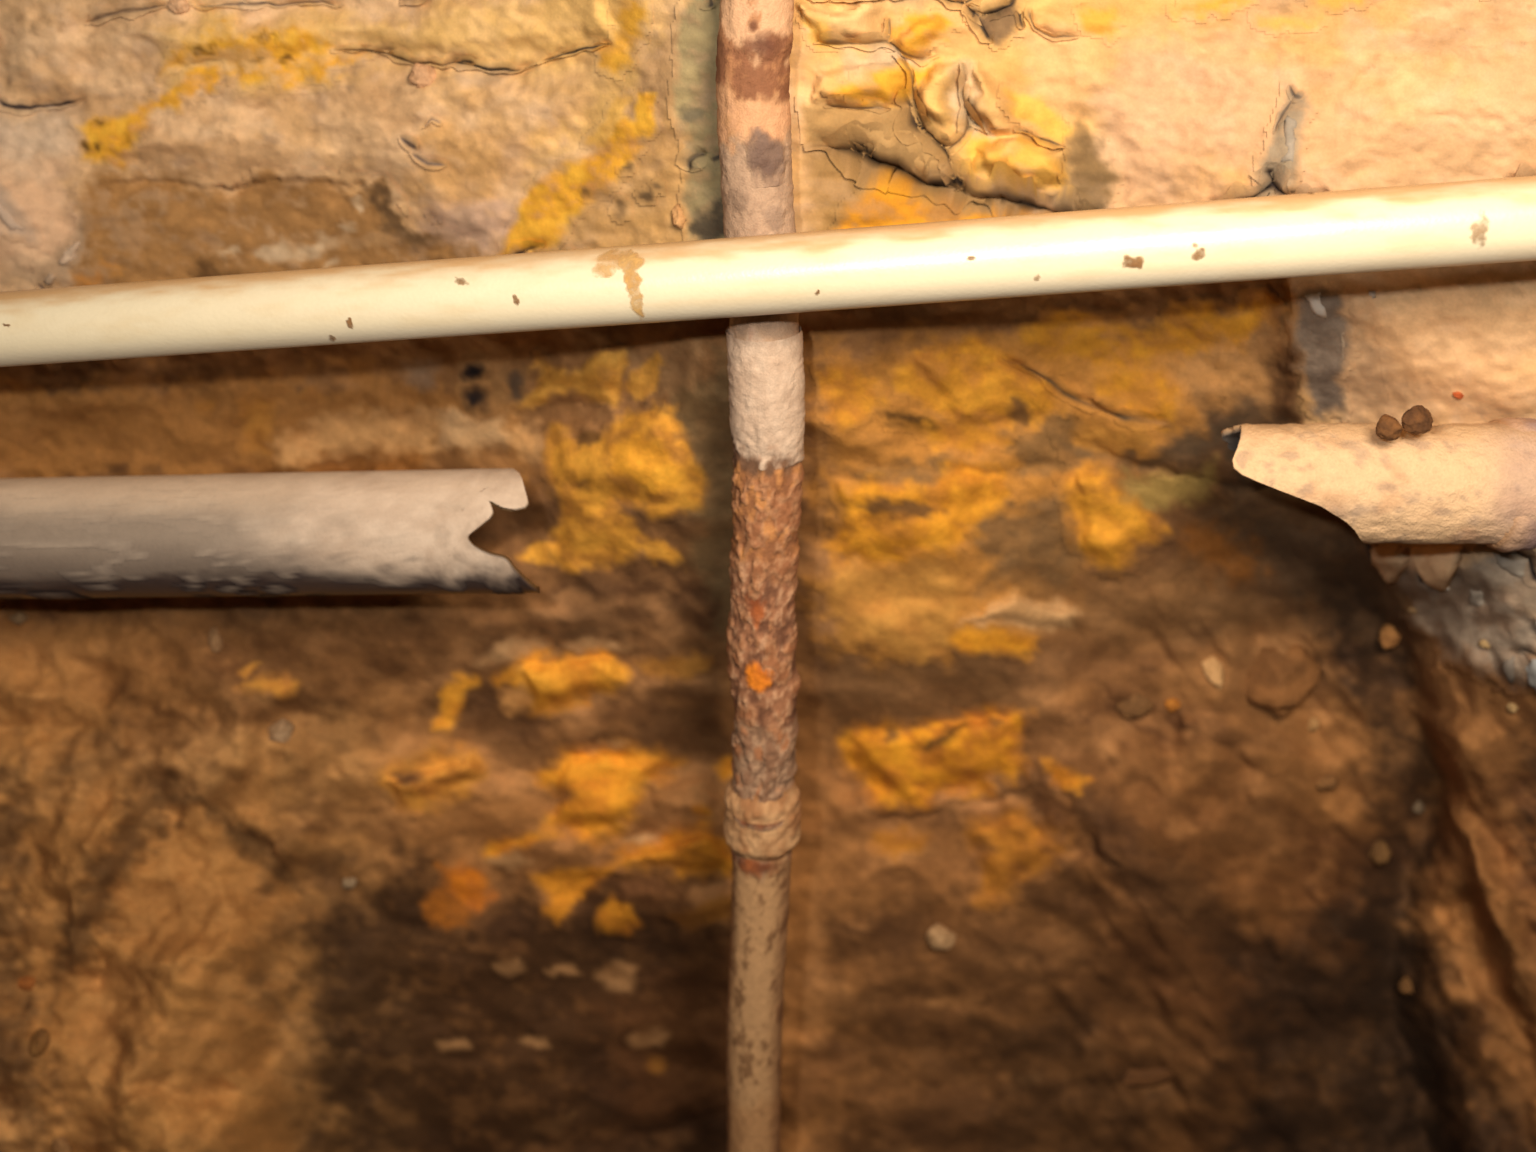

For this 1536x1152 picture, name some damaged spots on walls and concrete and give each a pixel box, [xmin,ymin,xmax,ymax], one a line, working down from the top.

crack [0,96,84,116]
crack [85,0,344,25]
leakage [65,0,725,287]
crack [330,42,611,74]
crack [1204,84,1325,201]
crack [1515,163,1536,177]
leakage [455,345,716,577]
leakage [809,286,1291,668]
leakage [366,630,733,998]
leakage [830,699,1098,917]
leakage [431,1034,475,1056]
leakage [620,1022,675,1079]